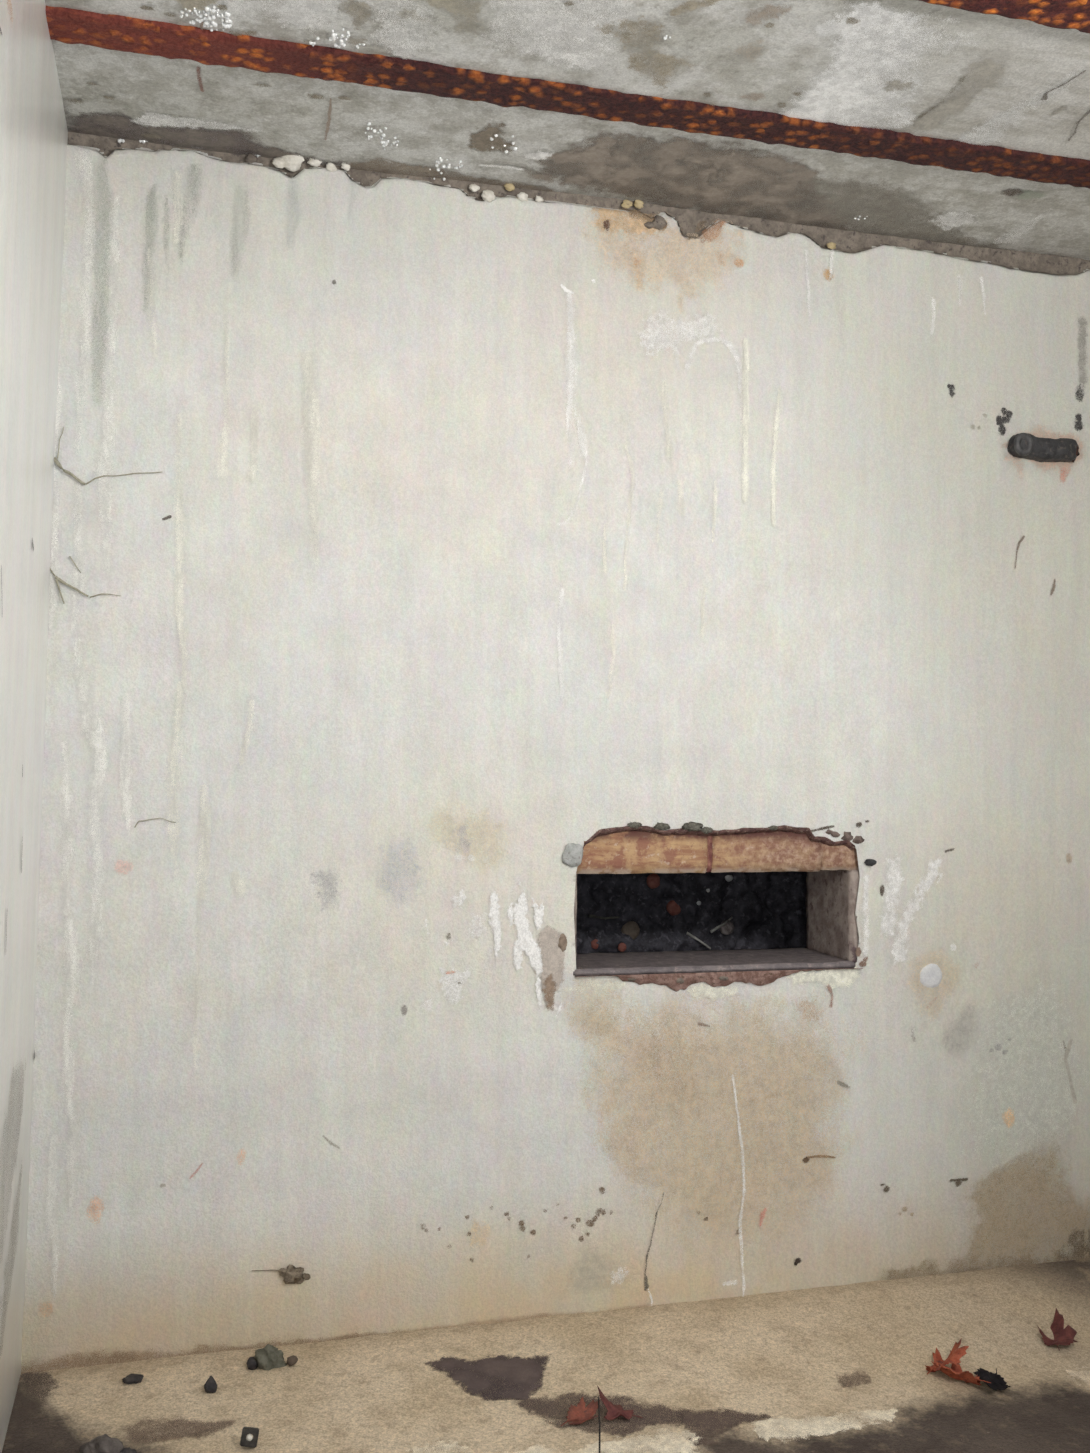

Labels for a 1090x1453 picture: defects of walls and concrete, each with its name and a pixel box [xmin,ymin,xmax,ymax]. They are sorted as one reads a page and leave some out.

leakage [594,0,718,98]
leakage [734,4,791,63]
leakage [45,82,1062,1298]
flaking render [583,821,865,850]
peeling [445,851,944,1017]
leakage [12,967,873,1417]
leakage [118,1416,248,1445]